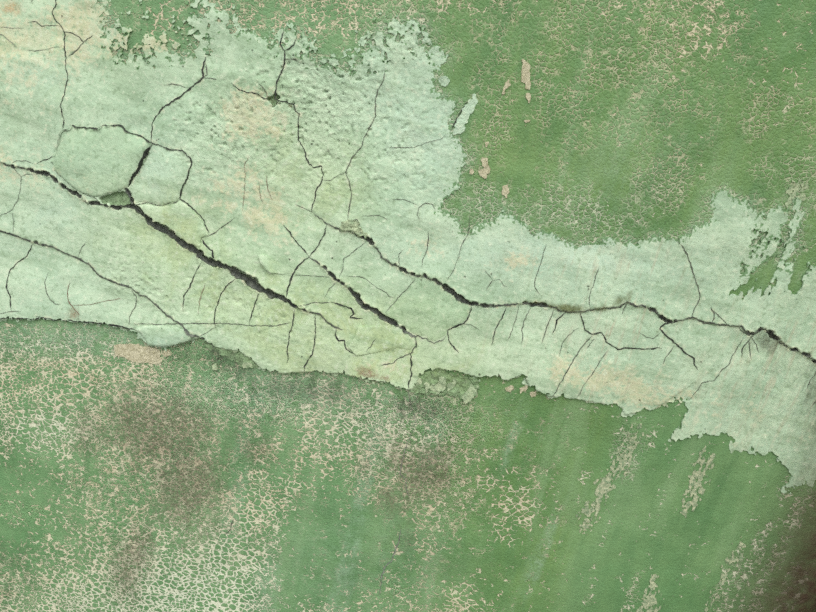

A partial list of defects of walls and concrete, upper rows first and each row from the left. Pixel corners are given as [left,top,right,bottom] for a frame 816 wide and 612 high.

peeling [521,59,531,103]
peeling [453,94,478,135]
peeling [469,157,490,179]
spalling [100,171,140,206]
crack [0,0,816,400]
peeling [783,179,809,208]
spalling [339,219,367,239]
peeling [114,343,162,364]
peeling [135,325,194,357]
spalling [410,368,480,404]
peeling [576,420,644,534]
peeling [678,445,716,518]